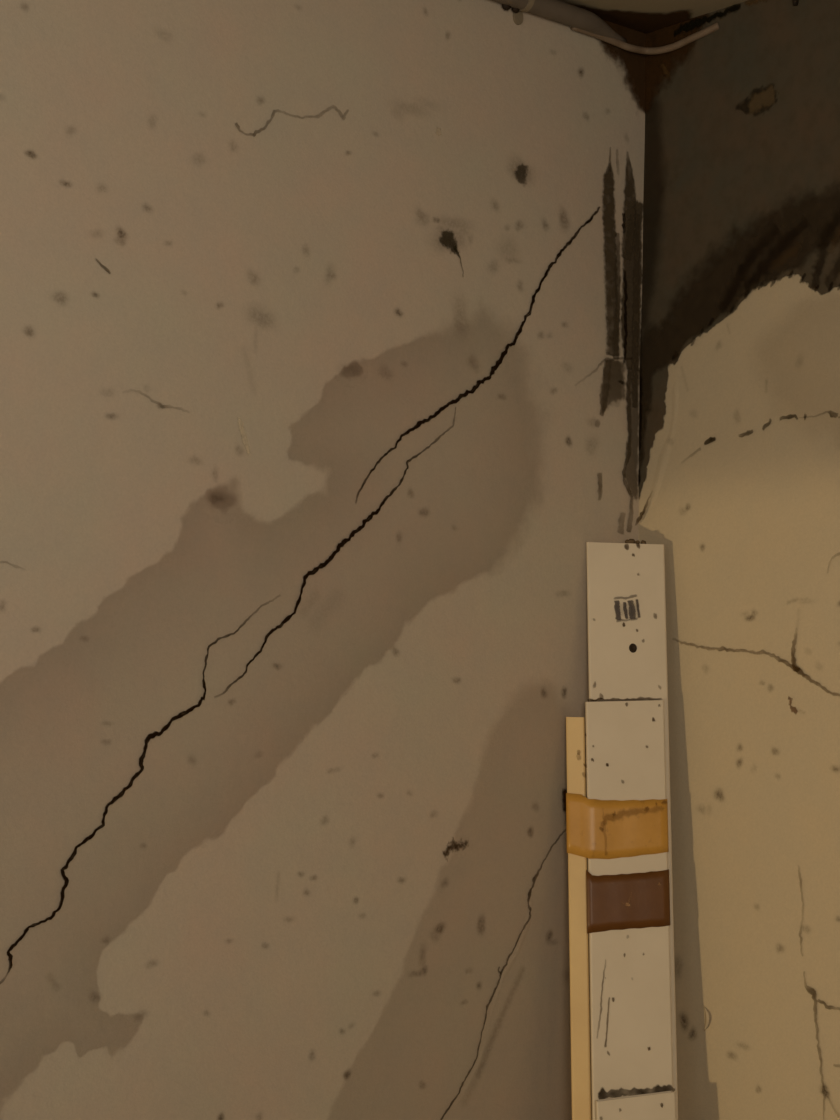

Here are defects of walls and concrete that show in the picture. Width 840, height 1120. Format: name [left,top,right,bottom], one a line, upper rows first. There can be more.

water stain [674,0,757,36]
water stain [600,158,640,504]
peeling [639,0,840,497]
crack [704,413,833,445]
crack [7,207,600,972]
crack [775,651,827,690]
crack [441,836,560,1120]
crack [807,988,831,1009]